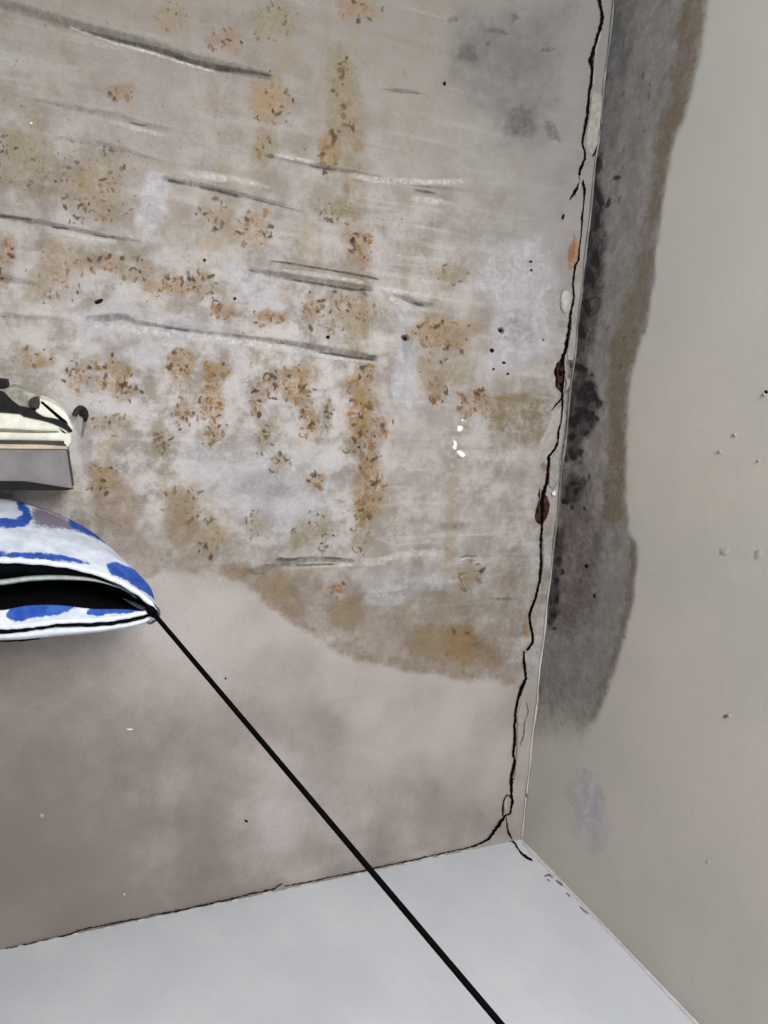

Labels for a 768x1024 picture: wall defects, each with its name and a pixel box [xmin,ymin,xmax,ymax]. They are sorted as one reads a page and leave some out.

corrosion [317,54,355,175]
corrosion [0,135,132,224]
corrosion [37,244,233,320]
corrosion [196,196,273,247]
corrosion [320,203,373,270]
corrosion [62,353,144,402]
corrosion [153,348,230,454]
corrosion [249,364,334,473]
crack [6,0,604,949]
corrosion [343,363,394,556]
corrosion [411,317,489,418]
water stain [539,0,702,712]